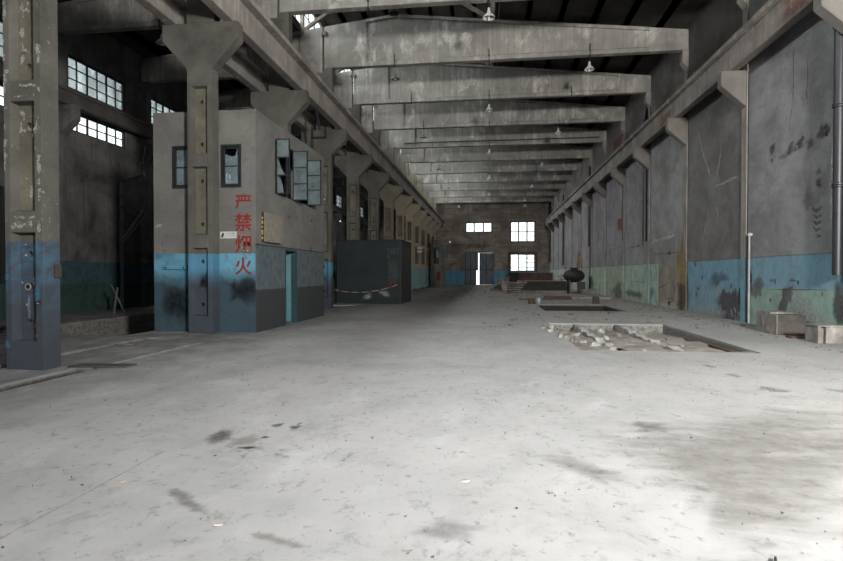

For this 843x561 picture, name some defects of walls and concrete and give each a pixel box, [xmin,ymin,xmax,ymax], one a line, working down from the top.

peeling [19,2,40,65]
peeling [3,54,40,135]
peeling [20,150,41,203]
peeling [5,216,41,232]